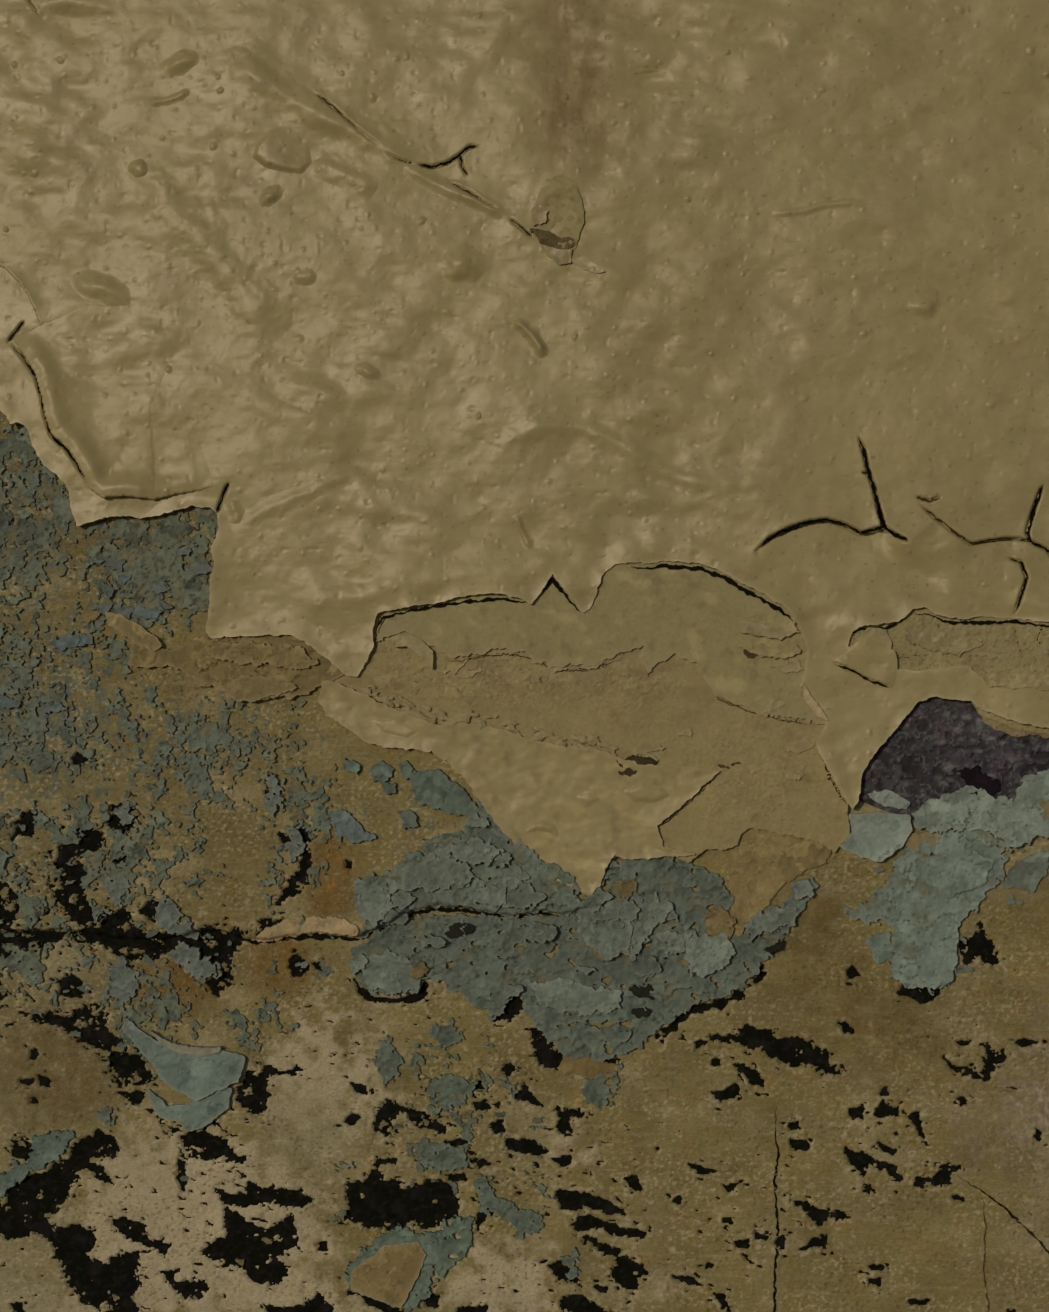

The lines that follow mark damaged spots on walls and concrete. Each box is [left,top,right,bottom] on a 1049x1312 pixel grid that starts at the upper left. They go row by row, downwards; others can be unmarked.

crack [316,94,532,237]
crack [7,321,84,477]
crack [762,435,909,546]
crack [918,486,1049,608]
peeling [0,304,1049,1312]